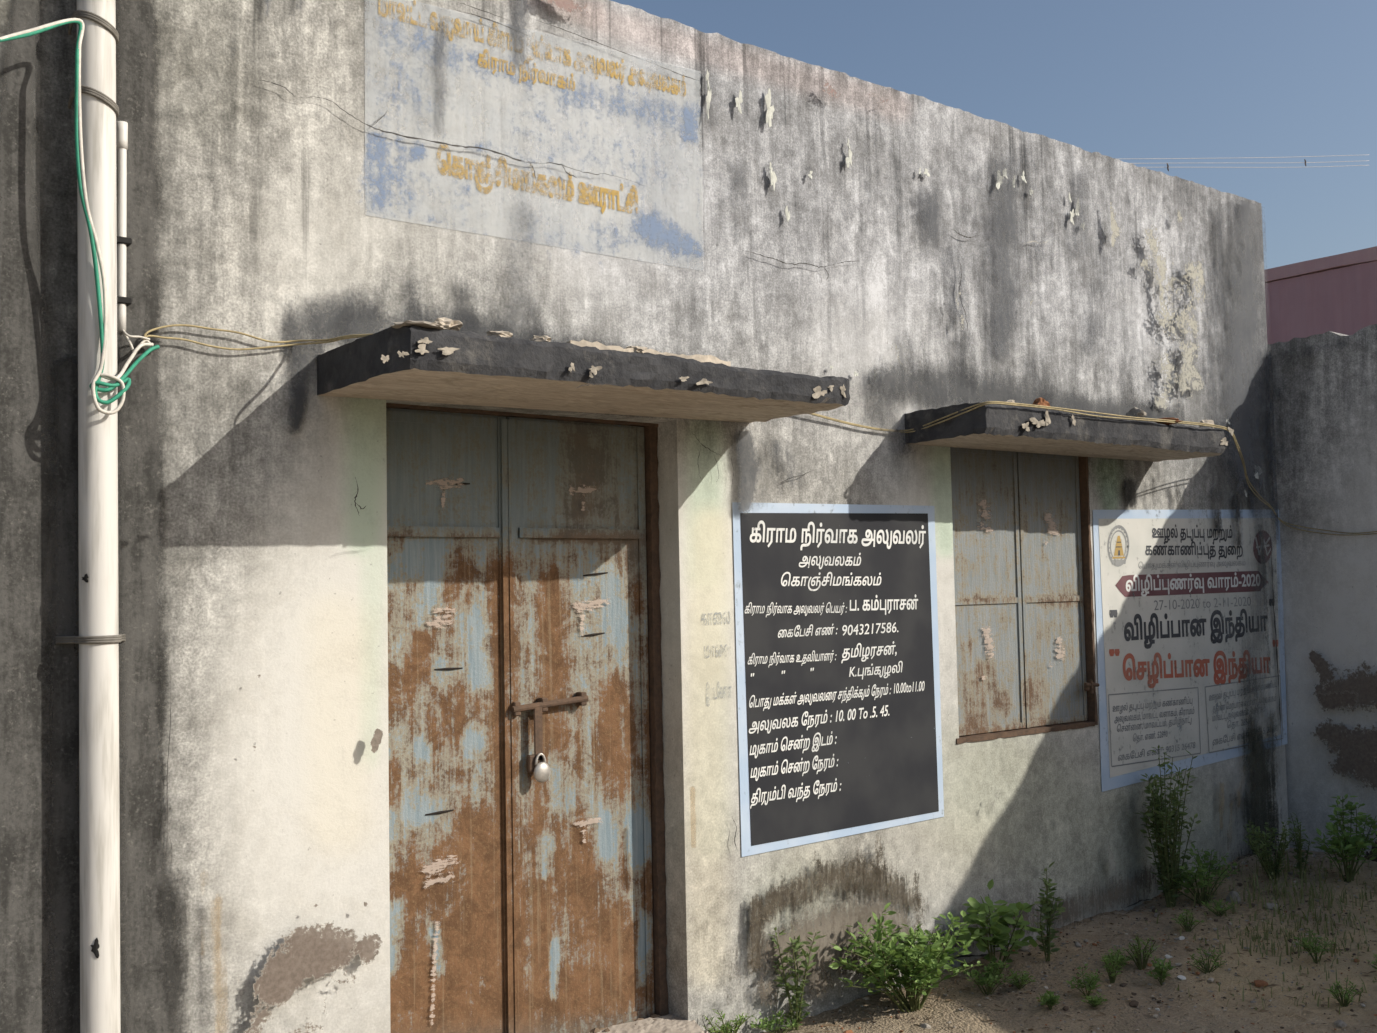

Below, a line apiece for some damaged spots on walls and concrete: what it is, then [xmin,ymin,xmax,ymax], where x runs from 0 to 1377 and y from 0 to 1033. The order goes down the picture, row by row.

crack [262,80,644,186]
peeling [765,89,775,127]
spalling [380,337,459,363]
water stain [871,335,1185,452]
peeling [1140,225,1209,412]
water stain [0,0,80,1033]
water stain [116,0,188,1033]
water stain [1124,479,1155,509]
water stain [1208,200,1280,860]
spalling [370,729,383,753]
spalling [1309,650,1377,794]
spalling [243,904,382,1033]